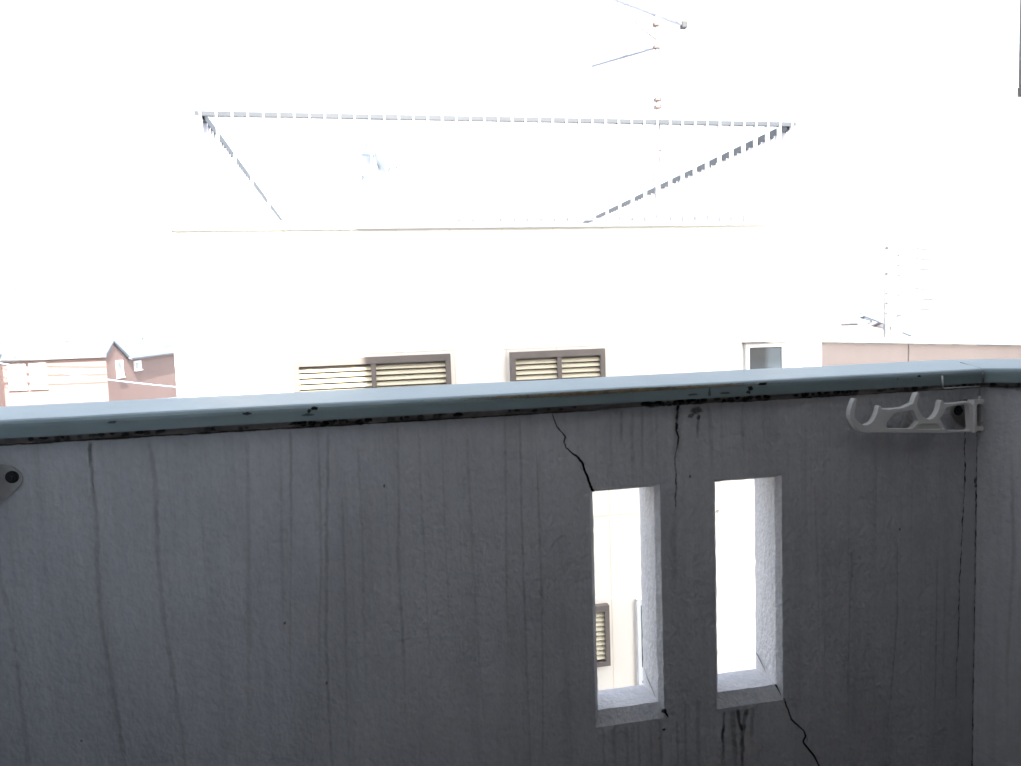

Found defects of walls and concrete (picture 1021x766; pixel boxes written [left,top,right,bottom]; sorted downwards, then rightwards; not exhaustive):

crack [552,414,594,492]
crack [673,406,681,446]
crack [756,653,819,766]